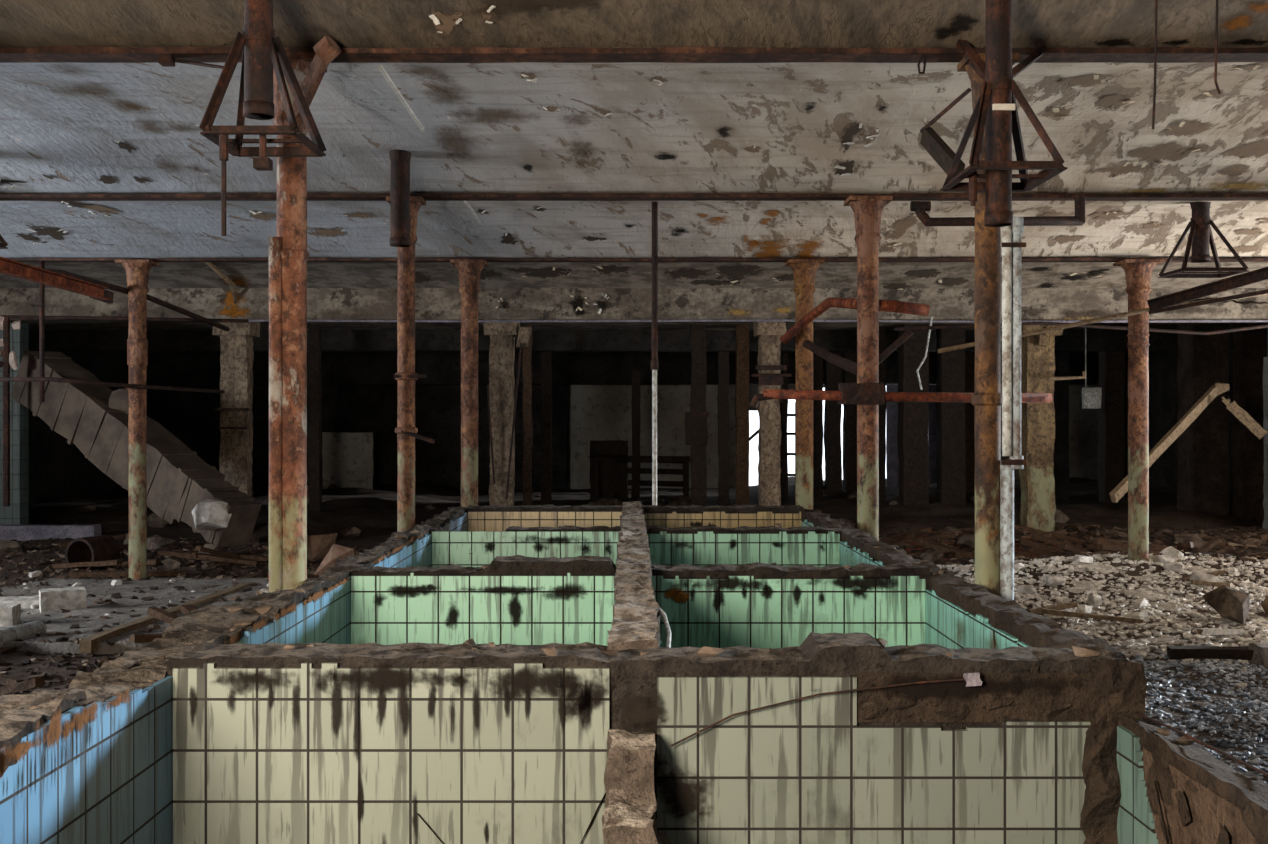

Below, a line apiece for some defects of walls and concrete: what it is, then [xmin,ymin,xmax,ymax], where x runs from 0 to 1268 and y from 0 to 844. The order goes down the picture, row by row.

peeling [1059,74,1137,110]
spalling [834,121,880,176]
peeling [1085,119,1268,179]
rust [743,210,822,258]
peeling [1226,218,1268,253]
damp [680,576,773,612]
damp [793,576,898,604]
damp [216,671,299,725]
damp [490,667,606,730]
rust [0,689,130,777]
damp [317,663,479,821]
spalling [1151,764,1257,844]